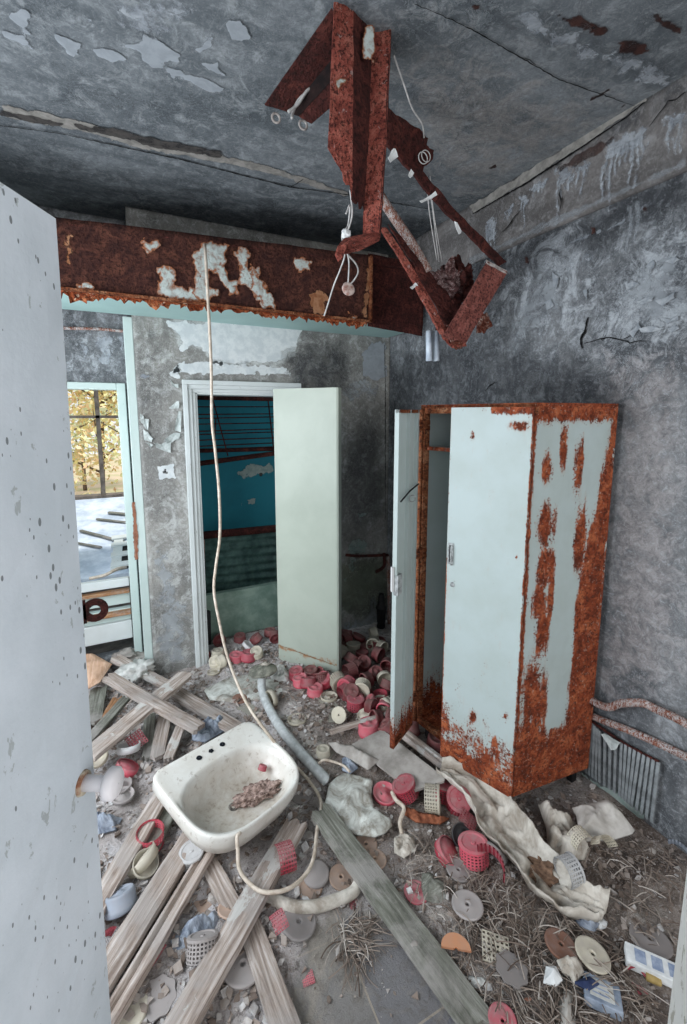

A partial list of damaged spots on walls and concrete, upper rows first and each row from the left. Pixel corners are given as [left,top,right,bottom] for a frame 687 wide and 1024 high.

peeling [2,9,34,50]
peeling [54,34,81,57]
peeling [93,4,226,93]
peeling [226,20,251,41]
crack [415,4,685,232]
efflorescence [600,127,646,196]
efflorescence [486,161,587,245]
corrosion [61,290,367,329]
peeling [166,320,302,388]
crack [580,317,646,348]
peeling [140,401,182,480]
peeling [237,463,274,479]